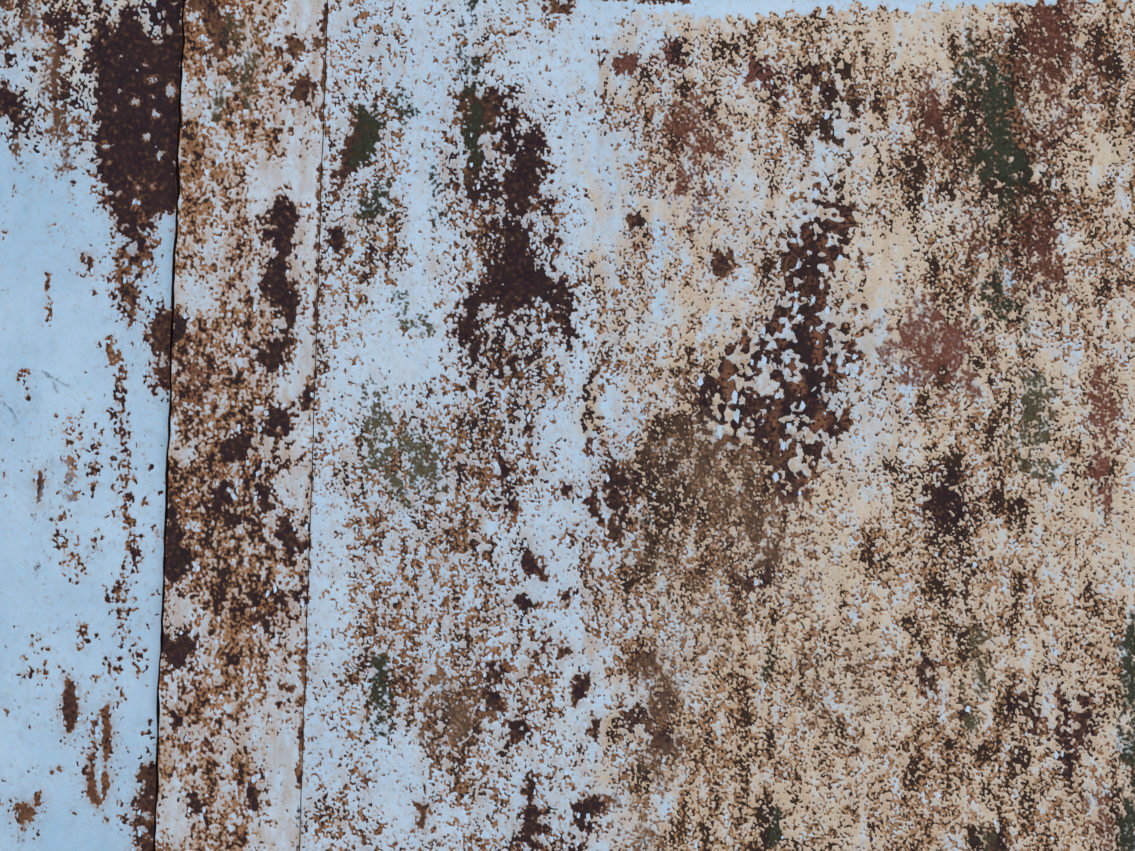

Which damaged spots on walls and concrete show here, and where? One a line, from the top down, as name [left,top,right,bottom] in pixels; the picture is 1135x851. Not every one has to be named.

peeling [424,0,455,39]
peeling [565,82,587,135]
peeling [604,0,698,47]
corrosion [598,31,707,82]
corrosion [735,41,792,106]
corrosion [308,163,398,389]
peeling [49,408,87,585]
corrosion [147,335,235,435]
corrosion [876,293,997,407]
corrosion [1087,365,1124,515]
corrosion [0,335,165,840]
corrosion [294,627,308,790]